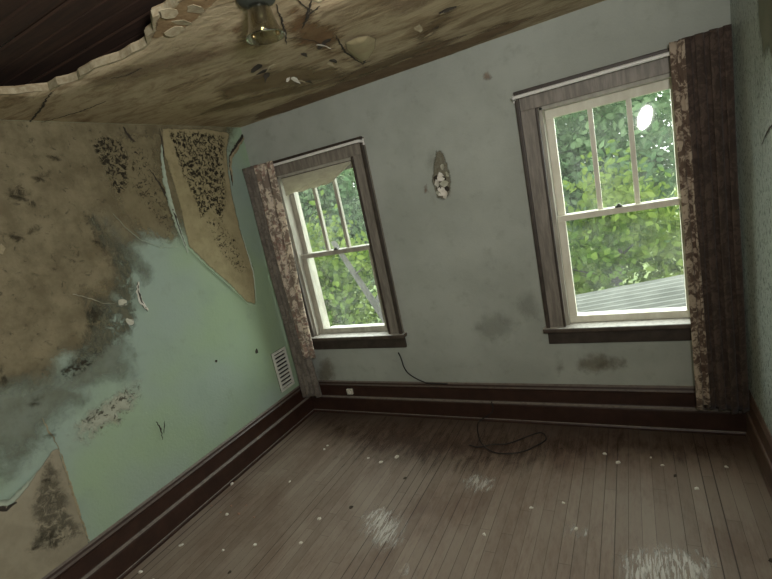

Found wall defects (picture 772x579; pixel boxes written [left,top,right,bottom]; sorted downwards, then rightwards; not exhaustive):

crack [30,91,106,123]
peeling [153,0,216,38]
water stain [201,11,531,119]
water stain [170,131,244,272]
peeling [0,120,245,461]
peeling [0,471,38,512]